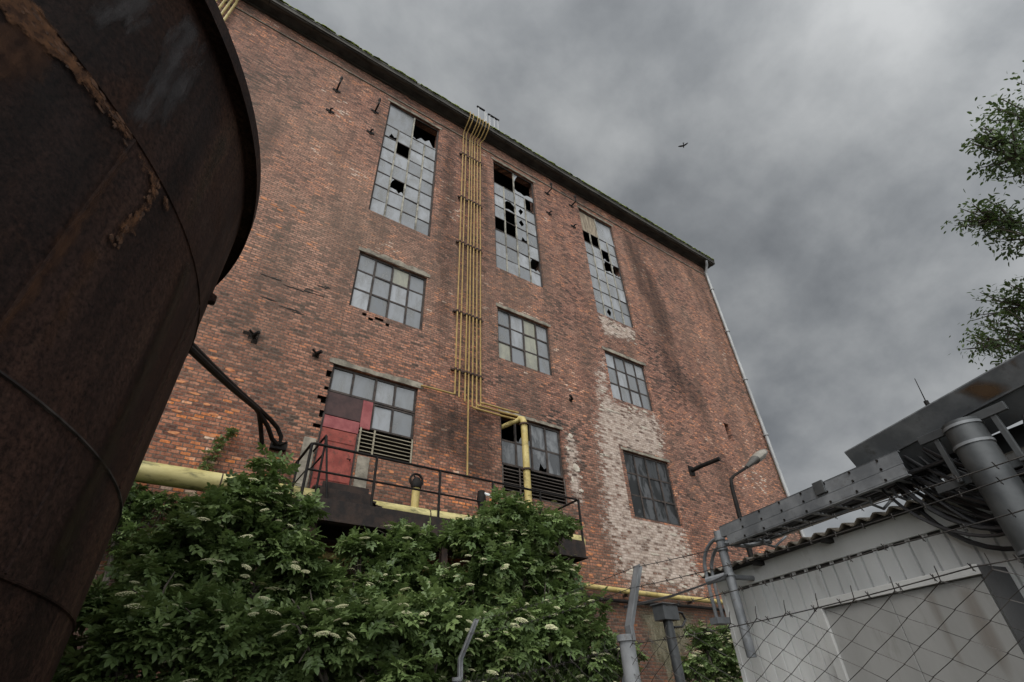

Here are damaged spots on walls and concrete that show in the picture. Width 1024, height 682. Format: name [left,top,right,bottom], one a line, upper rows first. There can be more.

corrosion [0,0,132,146]
corrosion [109,156,169,250]
peeling [565,433,584,505]
peeling [577,357,703,594]